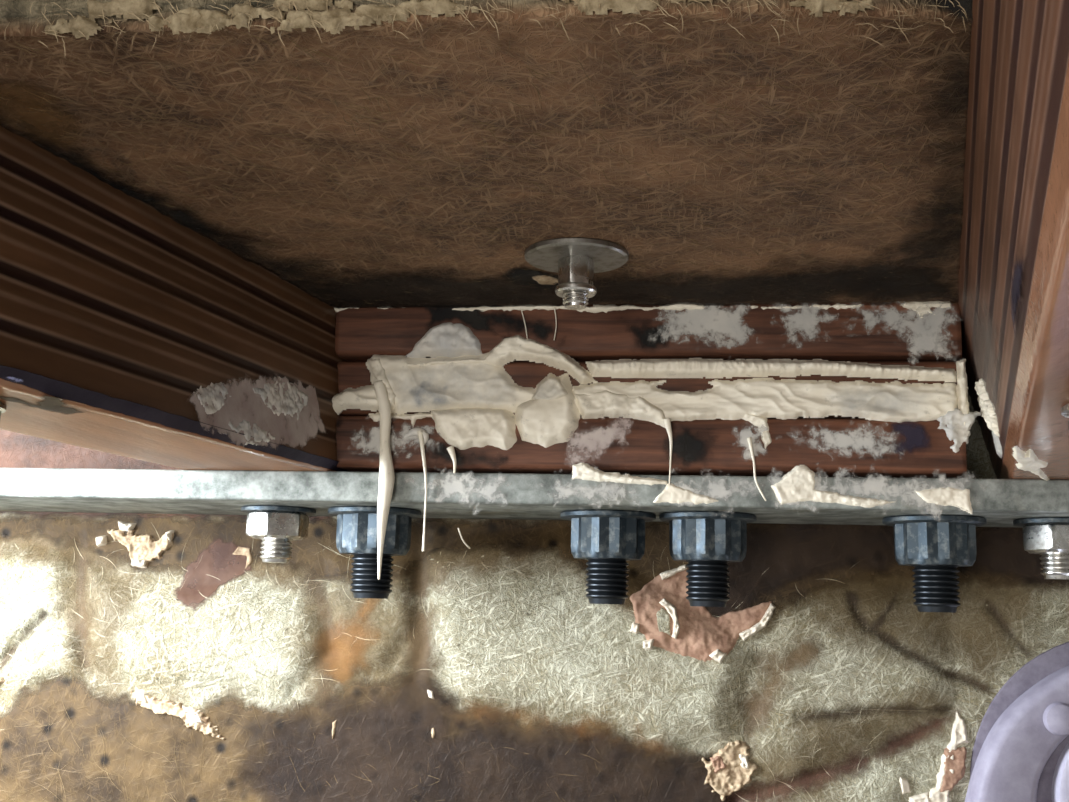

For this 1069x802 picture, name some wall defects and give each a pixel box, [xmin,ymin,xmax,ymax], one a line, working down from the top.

damp [932,0,973,20]
damp [0,85,565,308]
damp [588,187,964,306]
damp [0,429,183,470]
damp [0,511,730,802]
spalling [630,564,776,664]
damp [705,523,1069,657]